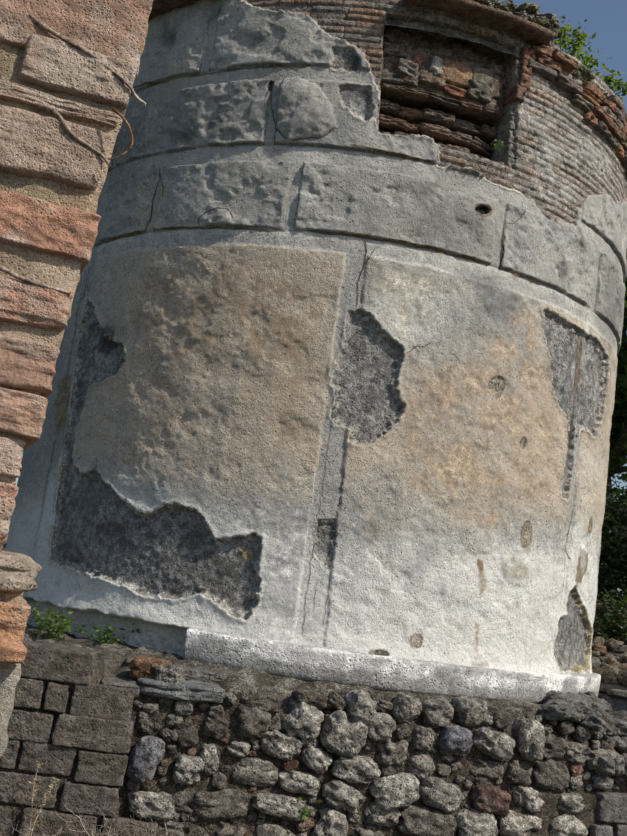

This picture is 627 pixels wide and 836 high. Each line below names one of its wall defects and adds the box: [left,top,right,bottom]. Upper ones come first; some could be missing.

flaking render [239,0,537,136]
crack [271,92,337,141]
flaking render [413,45,627,225]
crack [145,169,163,231]
crack [356,238,375,306]
crack [499,200,525,270]
flaking render [329,310,407,445]
flaking render [543,310,610,499]
flaking render [48,298,262,620]
flaking render [313,516,338,570]
flaking render [554,586,593,674]